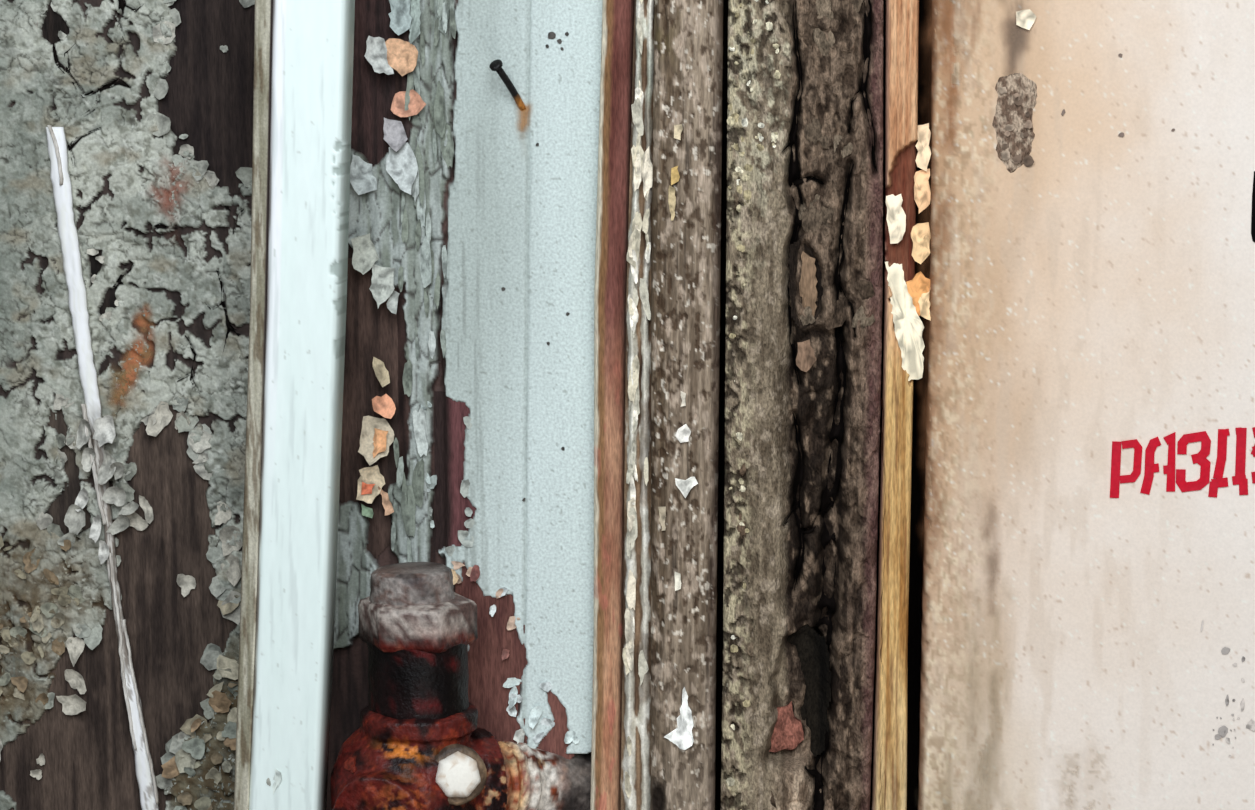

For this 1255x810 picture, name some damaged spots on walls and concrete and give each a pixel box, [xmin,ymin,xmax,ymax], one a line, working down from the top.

peeling [34,1,69,44]
leakage [1008,20,1023,59]
peeling [147,0,255,196]
rust [520,106,529,131]
peeling [84,248,105,287]
spalling [885,123,931,381]
peeling [99,281,130,321]
peeling [339,0,580,759]
peeling [0,394,242,810]